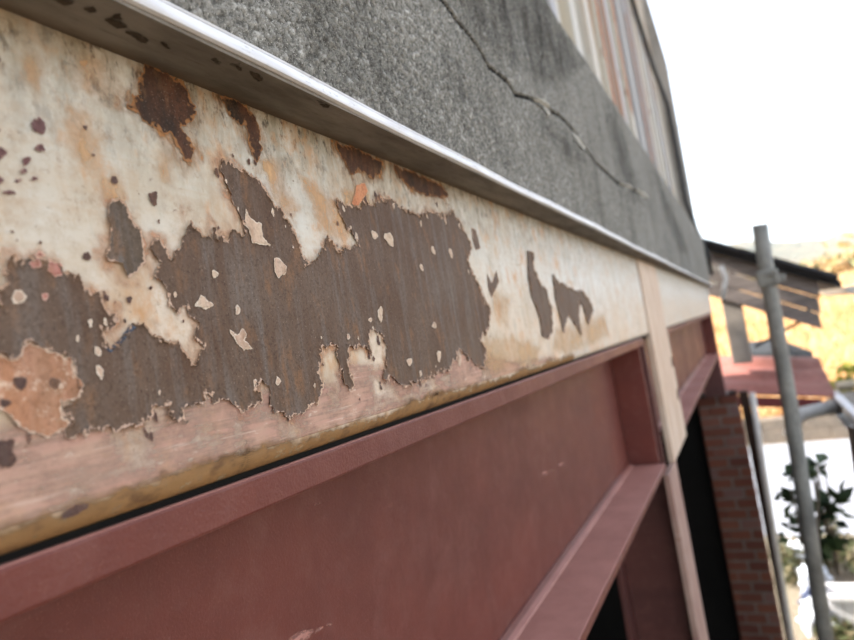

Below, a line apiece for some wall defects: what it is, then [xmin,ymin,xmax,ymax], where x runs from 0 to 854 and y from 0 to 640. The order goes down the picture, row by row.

corrosion [0,117,46,194]
corrosion [116,64,203,165]
corrosion [212,92,277,187]
corrosion [331,139,448,206]
crack [439,0,644,197]
peeling [0,153,555,530]
peeling [527,250,594,340]